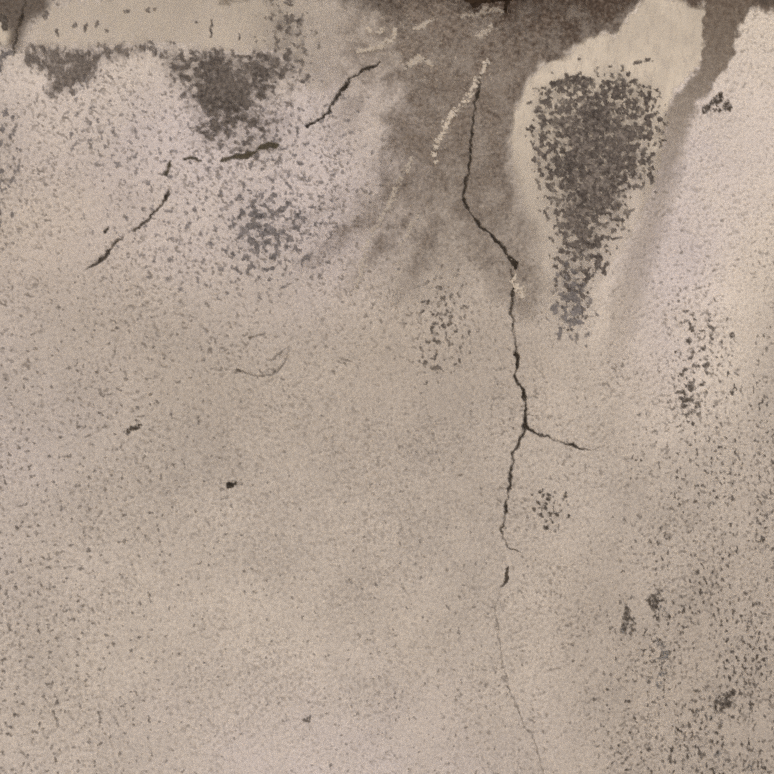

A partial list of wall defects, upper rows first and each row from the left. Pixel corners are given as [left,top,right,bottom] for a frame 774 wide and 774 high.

spalling [464,0,512,13]
leakage [24,41,166,99]
leakage [170,0,310,170]
crack [306,62,380,128]
leakage [336,0,774,339]
crack [88,190,170,268]
leakage [218,174,328,281]
leakage [419,286,470,370]
crack [462,79,585,587]
leakage [668,310,723,433]